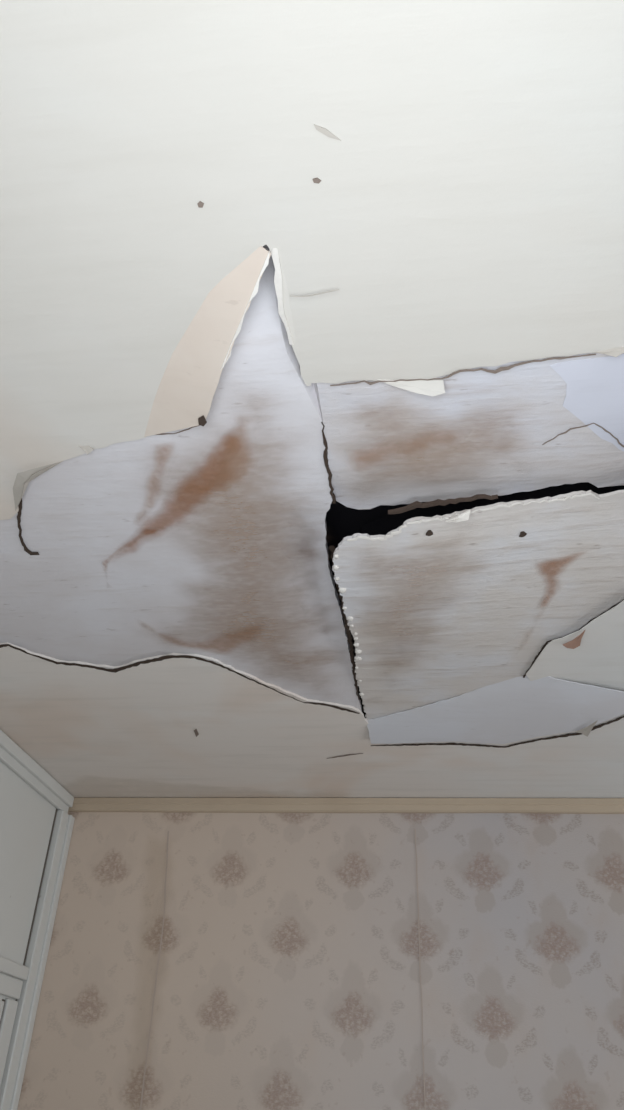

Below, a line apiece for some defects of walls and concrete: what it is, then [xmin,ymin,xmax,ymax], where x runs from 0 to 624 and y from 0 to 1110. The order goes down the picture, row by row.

flaking render [0,245,624,713]
crack [0,422,624,714]
crack [330,354,596,386]